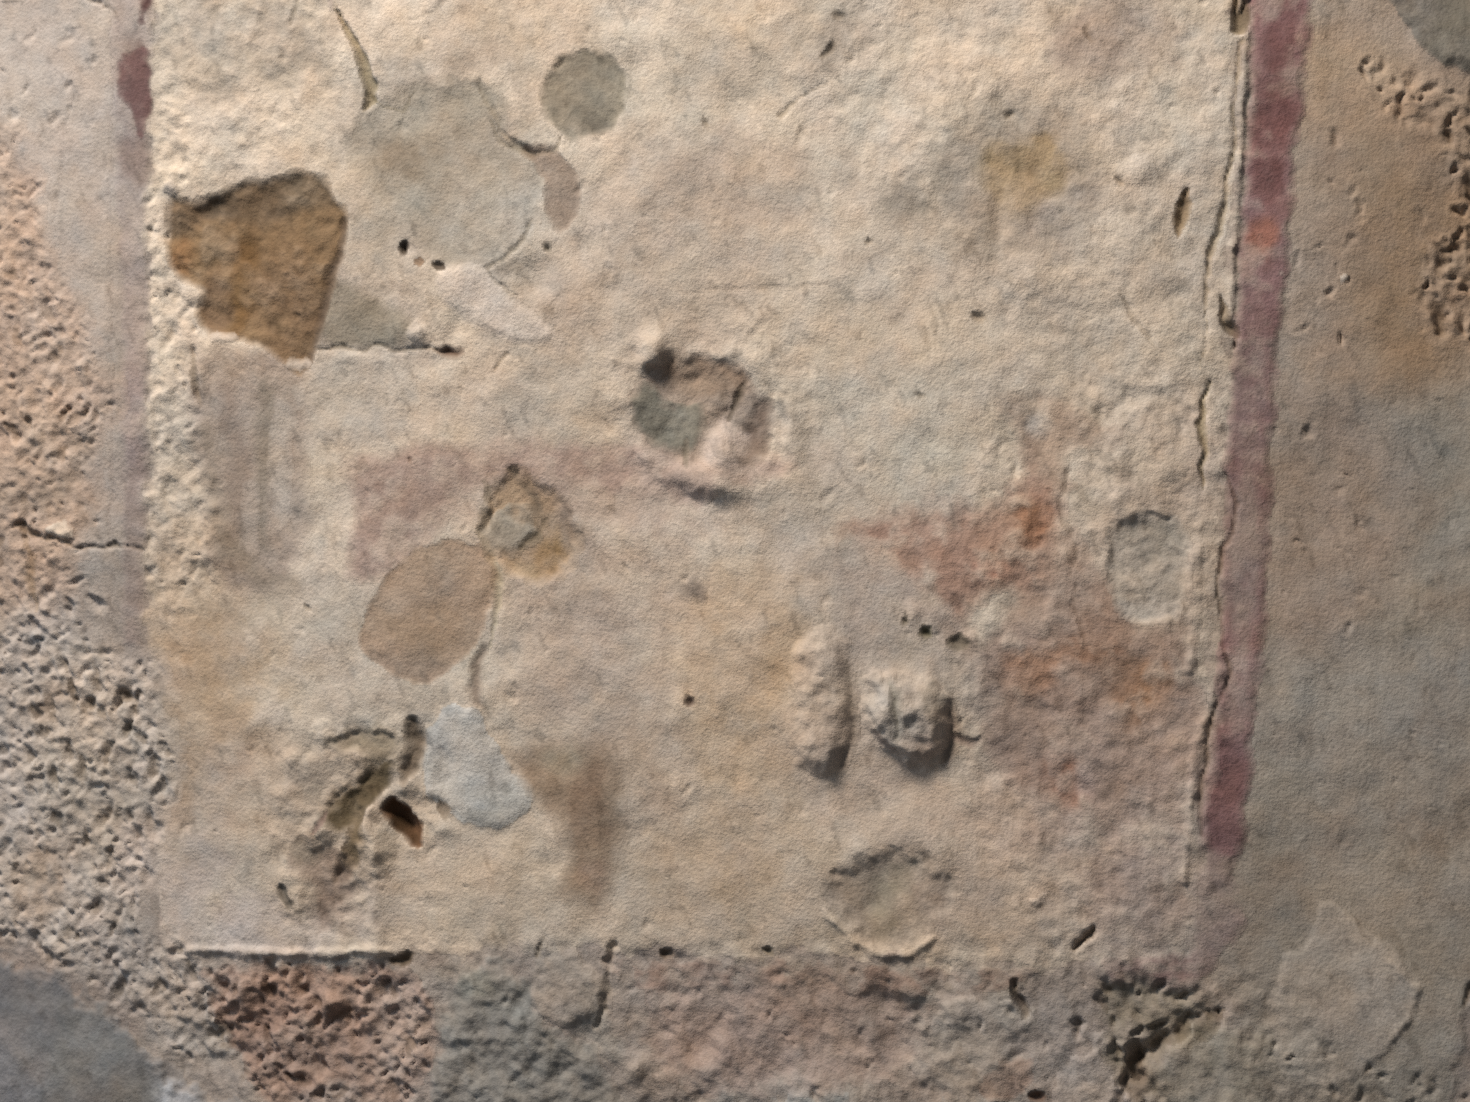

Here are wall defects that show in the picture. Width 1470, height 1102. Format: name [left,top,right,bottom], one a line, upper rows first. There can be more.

crack [289,0,416,113]
crack [1122,297,1158,350]
crack [1195,0,1251,836]
spalling [1404,86,1470,360]
spalling [0,109,446,1102]
crack [1462,982,1470,1009]